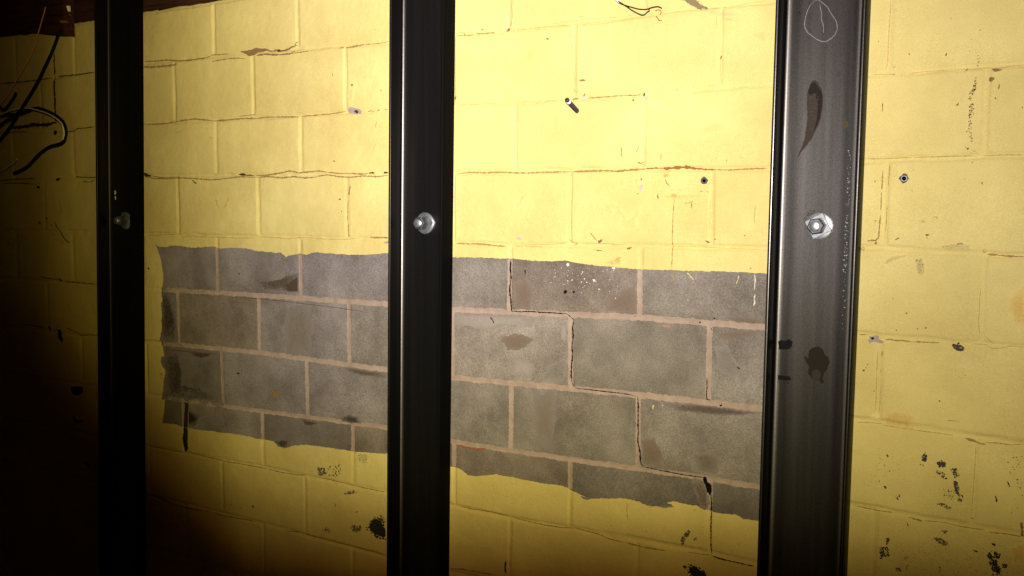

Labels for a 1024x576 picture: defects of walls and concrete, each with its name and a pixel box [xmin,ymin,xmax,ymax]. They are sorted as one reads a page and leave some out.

peeling [156,241,388,454]
mould [350,515,386,540]
peeling [450,257,767,521]
crack [457,165,767,566]
leakage [920,452,975,509]
leakage [879,530,1019,576]